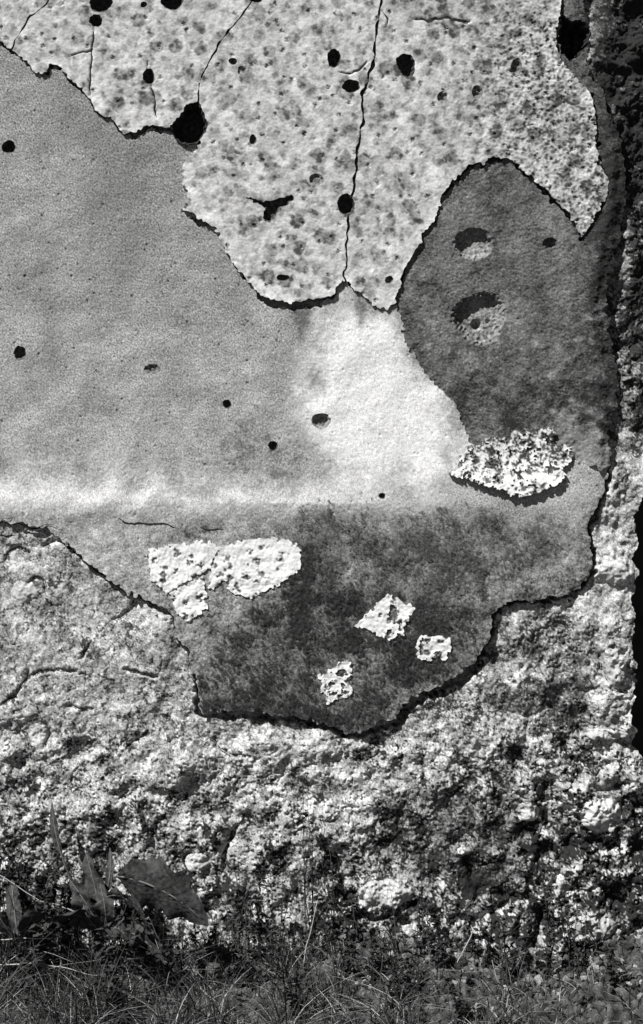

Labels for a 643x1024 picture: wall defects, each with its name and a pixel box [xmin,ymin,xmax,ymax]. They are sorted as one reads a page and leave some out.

crack [198,4,250,101]
peeling [0,0,643,311]
crack [340,0,388,282]
spalling [395,43,627,497]
damp [0,292,554,733]
spalling [0,301,643,959]
damp [486,614,603,743]